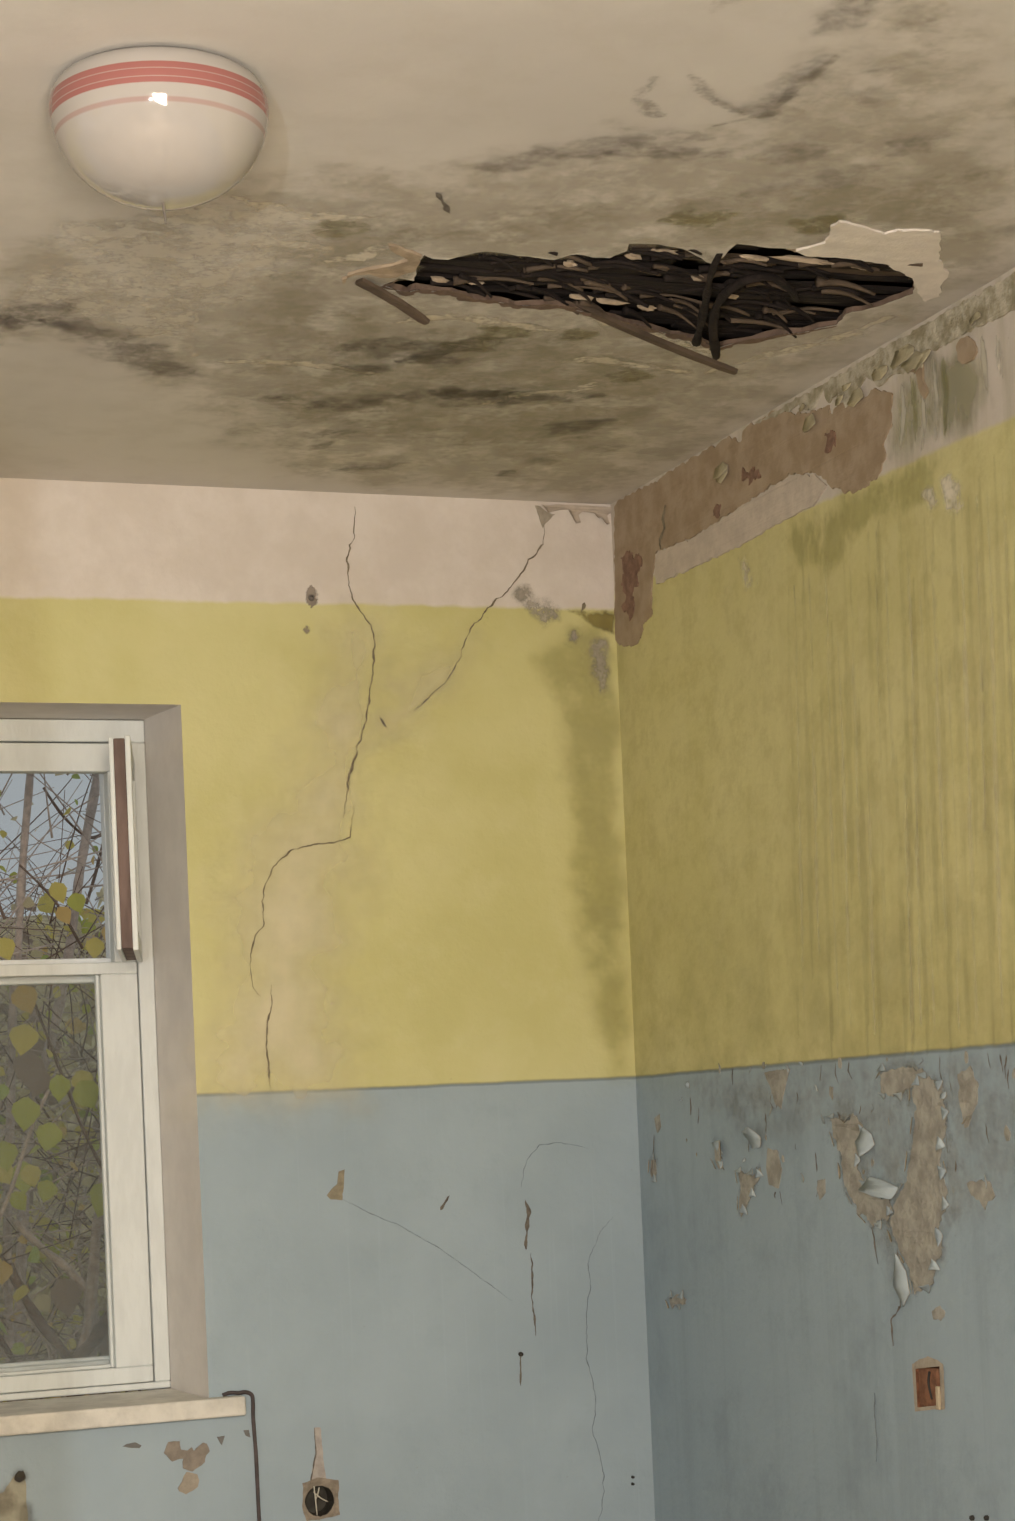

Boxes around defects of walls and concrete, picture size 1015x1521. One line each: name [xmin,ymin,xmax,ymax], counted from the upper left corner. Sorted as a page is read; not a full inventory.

water stain [1,196,389,335]
water stain [574,315,893,373]
flaking render [535,219,1015,689]
water stain [900,336,999,448]
crack [414,529,545,711]
peeling [515,588,558,622]
water stain [581,612,614,632]
crack [250,510,376,1084]
peeling [686,1051,1015,1342]
crack [586,1217,613,1521]
peeling [164,1436,225,1494]